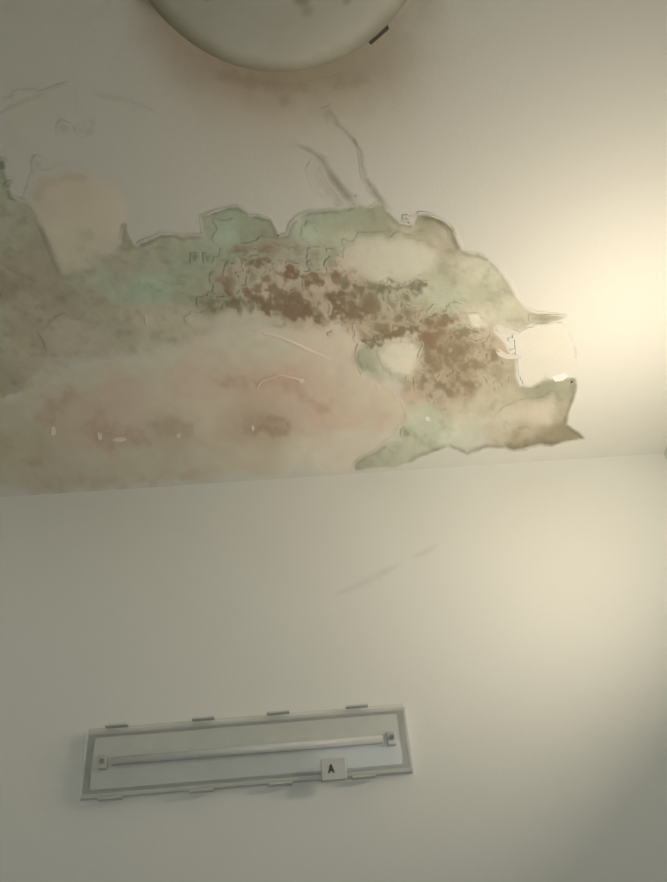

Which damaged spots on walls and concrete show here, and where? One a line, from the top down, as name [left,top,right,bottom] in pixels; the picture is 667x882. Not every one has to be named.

leakage [22,161,135,267]
crack [294,106,397,219]
peeling [0,151,586,473]
leakage [0,328,406,496]